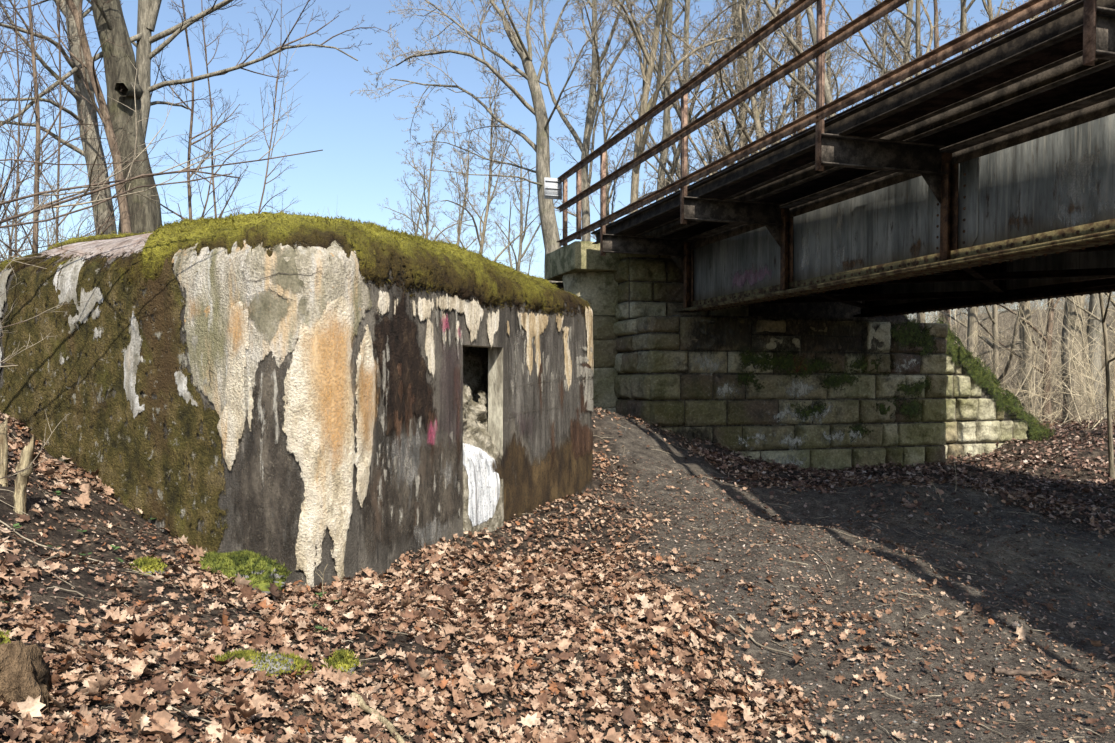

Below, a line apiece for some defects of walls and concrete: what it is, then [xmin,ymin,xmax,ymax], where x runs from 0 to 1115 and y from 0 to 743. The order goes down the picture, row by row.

peeling [0,267,14,330]
peeling [39,233,152,341]
peeling [172,240,372,419]
water stain [376,290,398,314]
water stain [217,294,594,588]